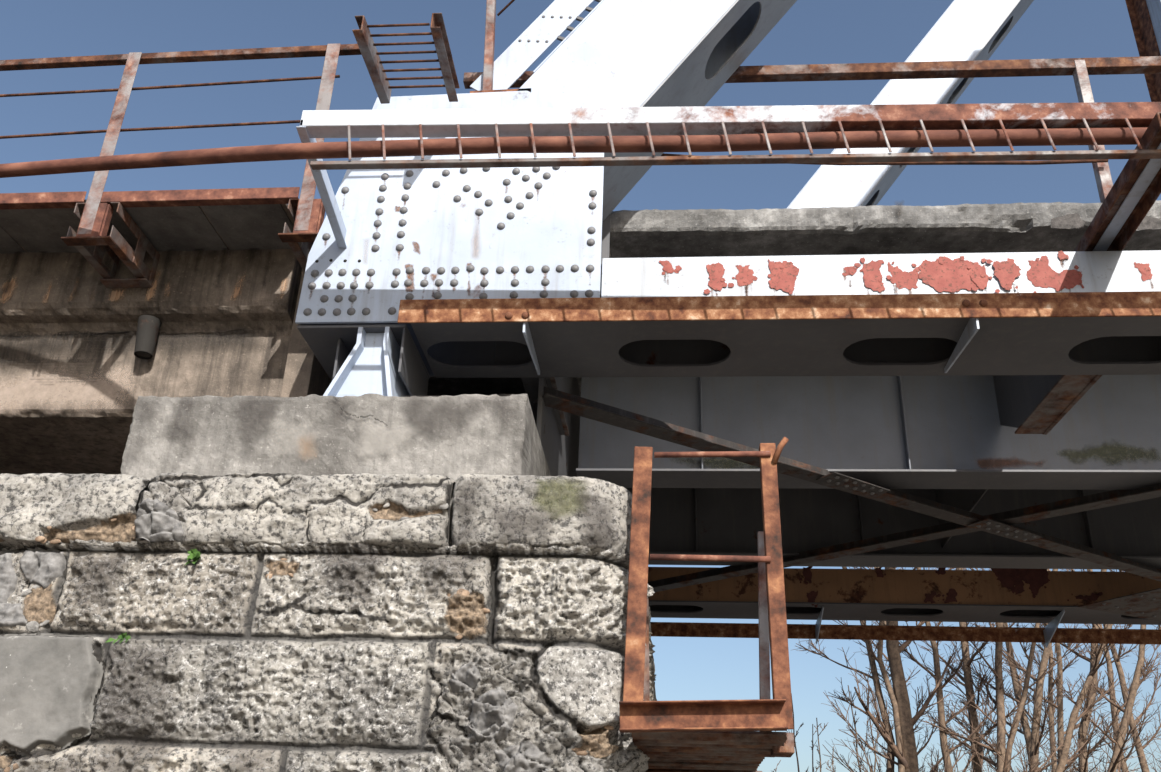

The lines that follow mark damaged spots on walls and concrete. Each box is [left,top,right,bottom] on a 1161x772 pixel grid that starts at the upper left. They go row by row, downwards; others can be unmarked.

peeling [659,260,682,282]
peeling [704,259,799,296]
peeling [842,251,1084,294]
peeling [1134,262,1153,288]
leakage [1062,444,1156,464]
crack [132,473,453,545]
peeling [0,512,137,632]
crack [258,593,389,623]
spalling [444,588,490,640]
crack [486,549,586,734]
crack [425,671,467,769]